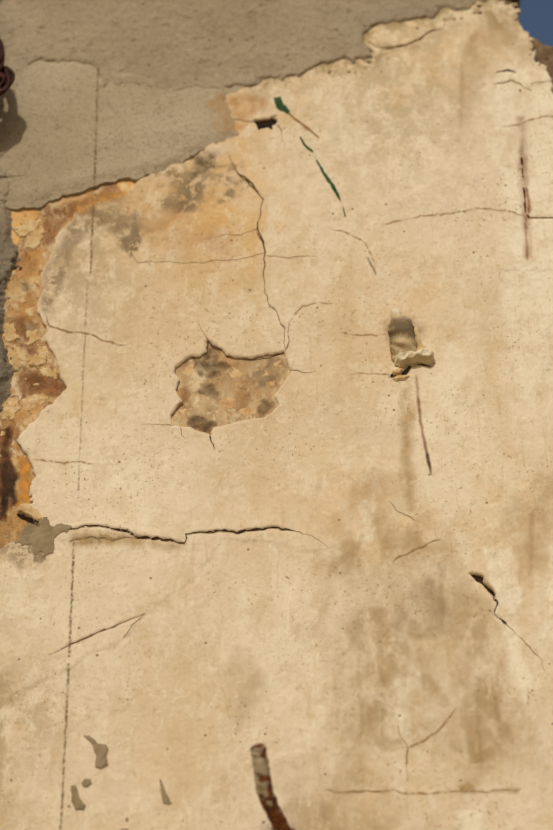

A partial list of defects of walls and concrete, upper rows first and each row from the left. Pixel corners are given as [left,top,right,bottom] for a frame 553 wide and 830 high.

crack [131,154,326,349]
crack [387,208,553,224]
flaking render [0,183,121,548]
crack [47,320,122,346]
flaking render [160,321,315,449]
crack [68,525,329,548]
crack [471,575,546,672]
rust [250,743,294,830]